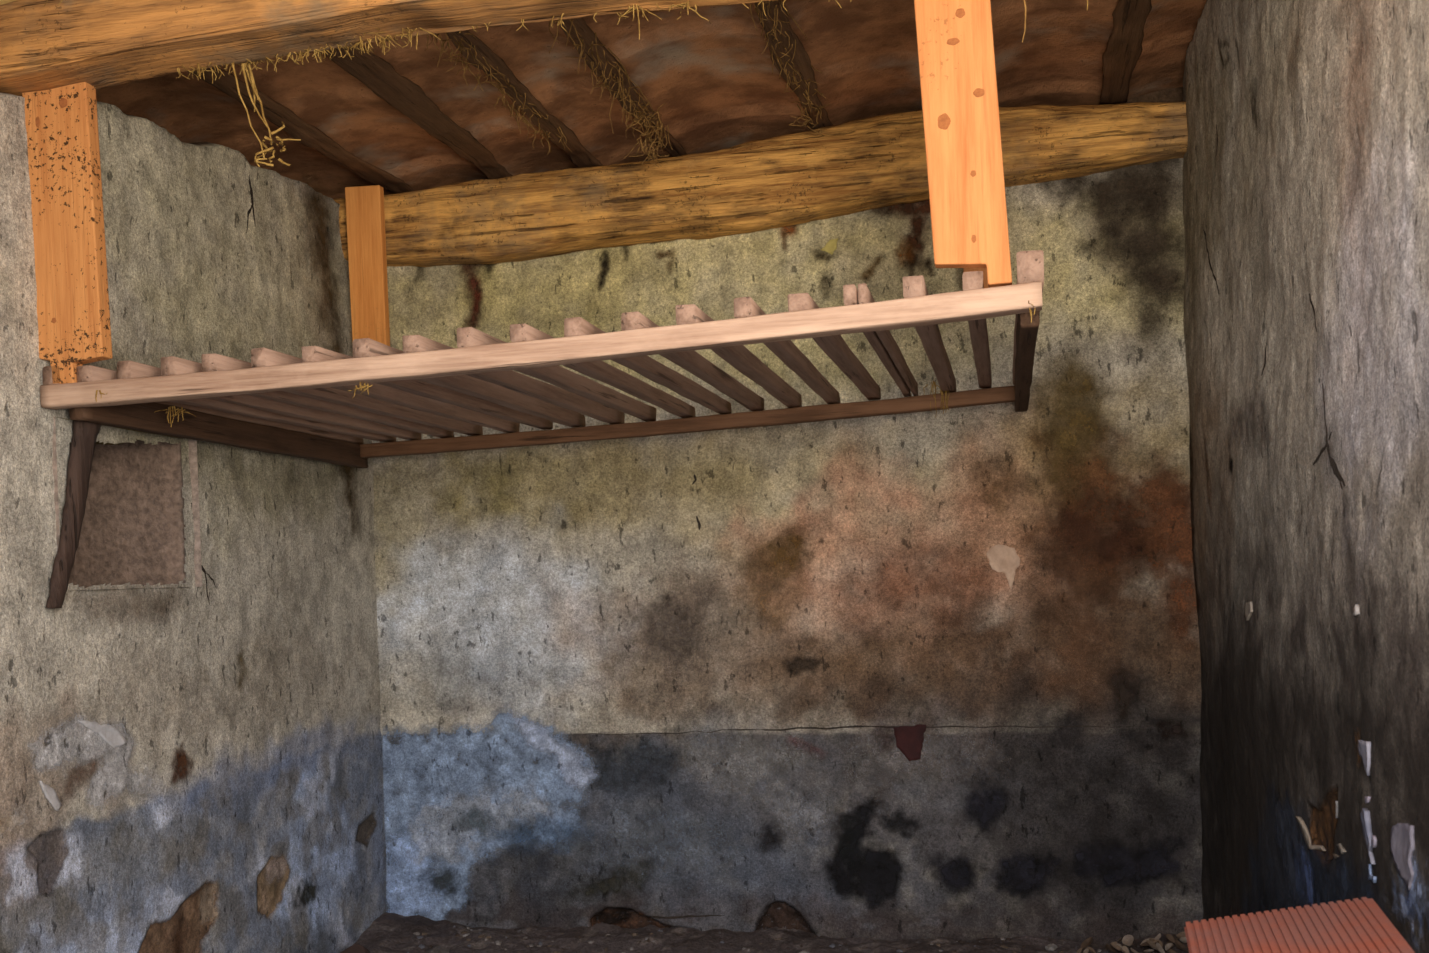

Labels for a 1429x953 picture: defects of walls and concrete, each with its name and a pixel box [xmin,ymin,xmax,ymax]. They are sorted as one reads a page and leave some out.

crack [1313,383,1345,489]
peeling [986,544,1020,590]
peeling [30,717,151,811]
leakage [849,734,944,784]
peeling [1357,737,1371,776]
leakage [571,736,918,909]
leakage [966,782,1007,831]
spalling [27,829,69,896]
spalling [138,882,218,953]
leakage [297,881,316,905]
leakage [935,857,976,892]
leakage [997,840,1182,897]